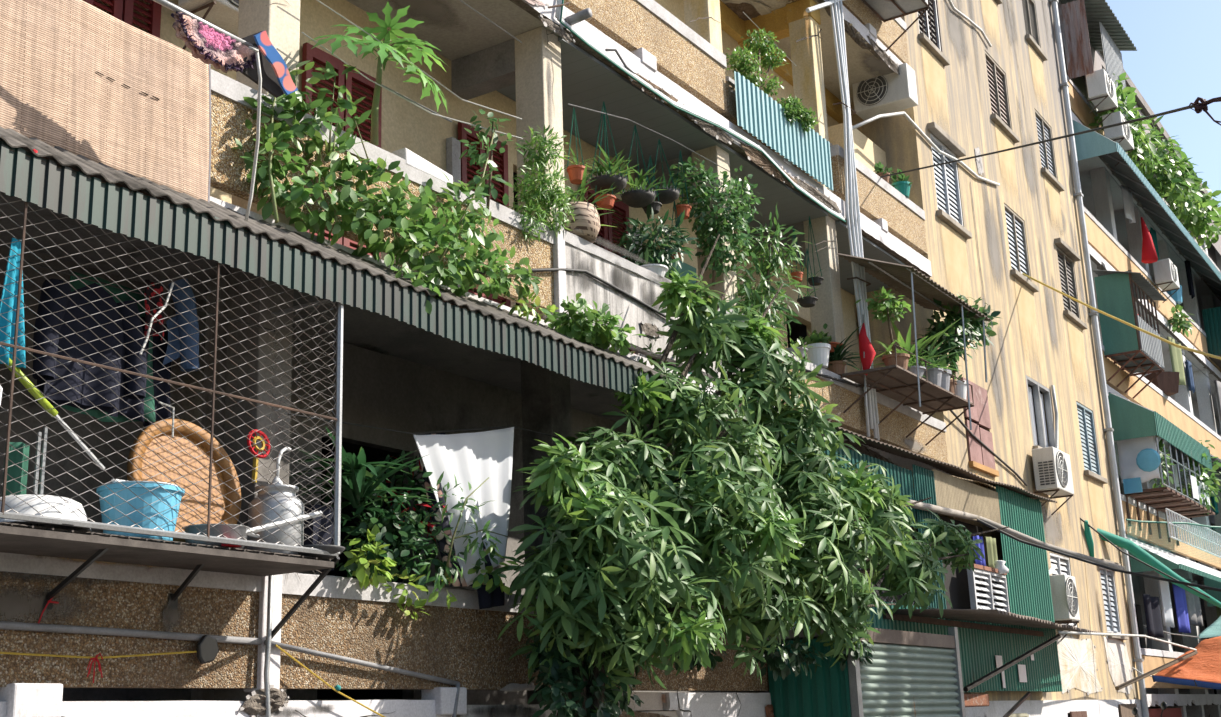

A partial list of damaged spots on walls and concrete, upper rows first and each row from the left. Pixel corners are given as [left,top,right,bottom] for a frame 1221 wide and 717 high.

spalling [240,685,289,717]